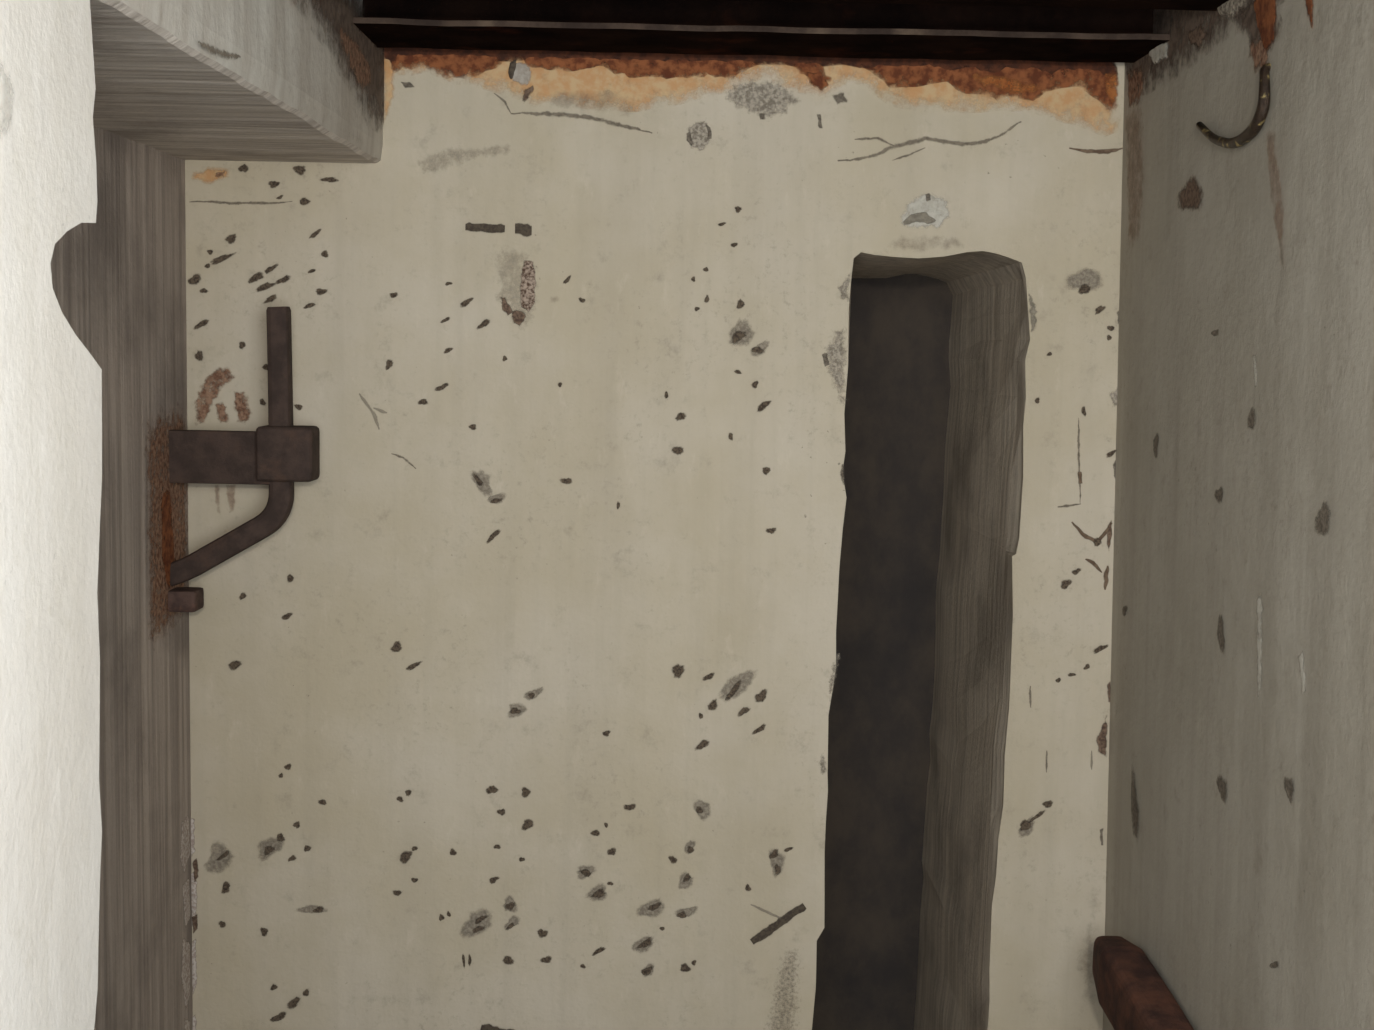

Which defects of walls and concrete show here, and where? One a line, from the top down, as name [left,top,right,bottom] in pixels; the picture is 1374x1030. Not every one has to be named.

rust [302,0,1144,130]
rust [1250,0,1276,70]
peeling [728,81,797,119]
crack [838,121,1021,161]
spalling [902,194,949,227]
spalling [477,261,536,329]
rust [147,368,250,639]